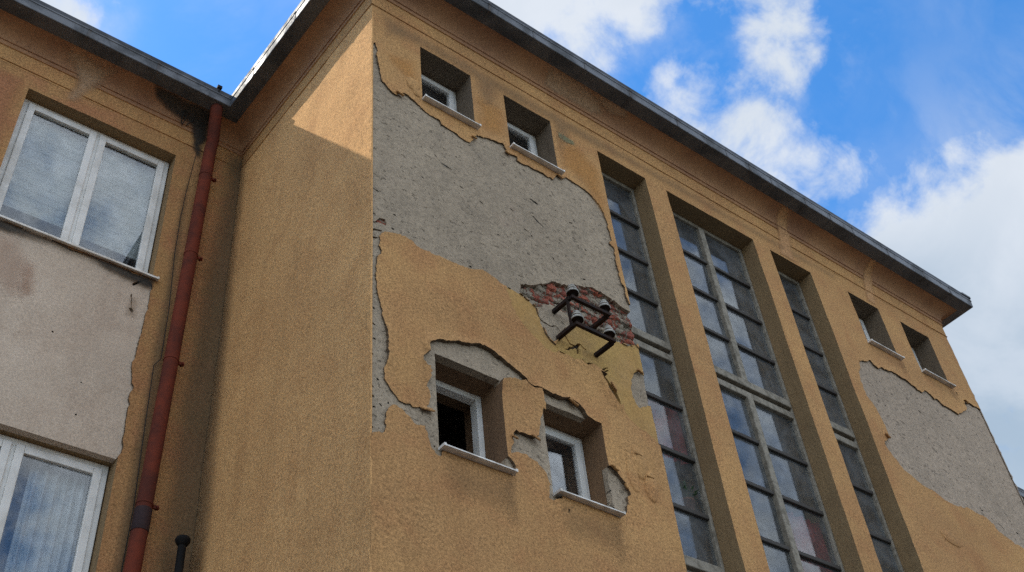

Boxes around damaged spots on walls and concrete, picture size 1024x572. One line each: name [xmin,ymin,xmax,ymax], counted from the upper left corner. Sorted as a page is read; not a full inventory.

leakage [156,87,210,155]
peeling [0,220,151,463]
peeling [372,44,659,456]
peeling [859,361,1024,548]